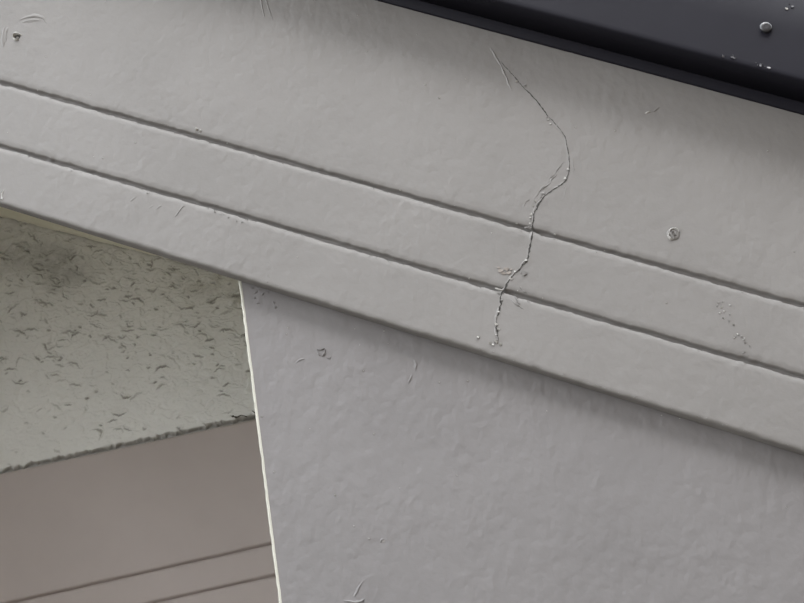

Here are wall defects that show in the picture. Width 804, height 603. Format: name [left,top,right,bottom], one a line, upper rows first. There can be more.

crack [490,47,574,342]